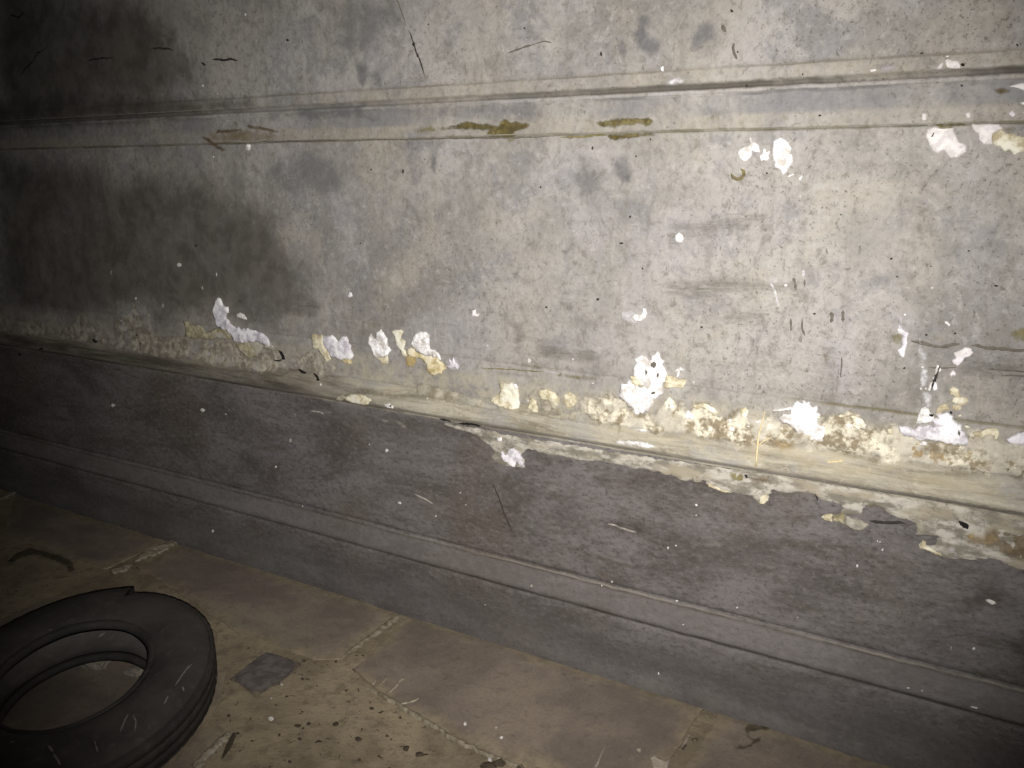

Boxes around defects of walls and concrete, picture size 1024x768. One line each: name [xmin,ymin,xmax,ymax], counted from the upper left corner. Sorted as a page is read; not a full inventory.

leakage [0,1,196,125]
peeling [737,138,802,180]
peeling [926,126,966,158]
peeling [972,124,1024,155]
leakage [3,166,291,315]
peeling [0,298,354,377]
peeling [368,329,446,376]
peeling [950,347,973,377]
peeling [490,382,577,415]
peeling [444,423,1024,570]